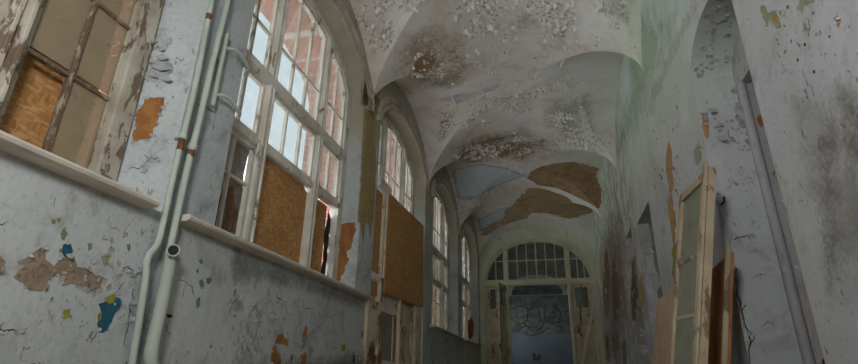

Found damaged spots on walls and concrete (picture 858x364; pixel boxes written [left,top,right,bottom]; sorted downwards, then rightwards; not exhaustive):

peeling [130,95,166,147]
flaking render [362,82,378,114]
peeling [354,0,426,66]
flaking render [406,49,455,101]
peeling [445,0,602,91]
peeling [760,0,815,58]
flaking render [434,96,611,235]
peeling [0,218,134,343]
peeling [337,222,358,281]
crack [0,323,26,339]
peeling [270,325,308,364]
crack [733,269,770,364]